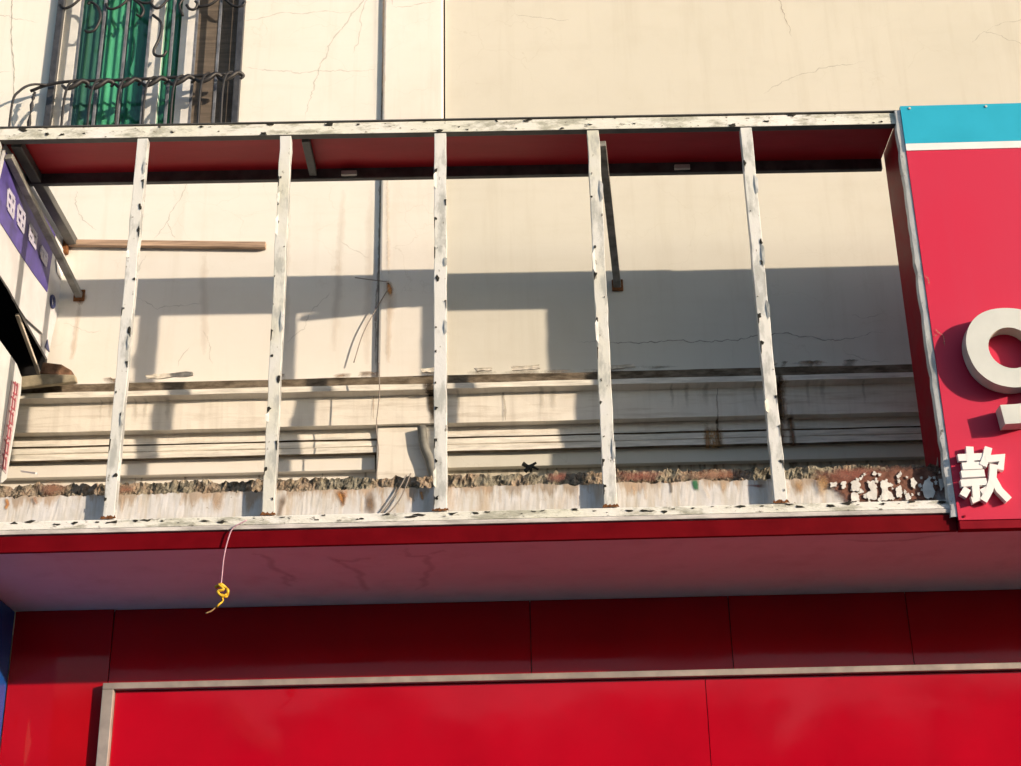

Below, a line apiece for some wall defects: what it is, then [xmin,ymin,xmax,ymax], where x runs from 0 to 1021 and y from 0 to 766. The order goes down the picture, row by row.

peeling [818,466,945,502]